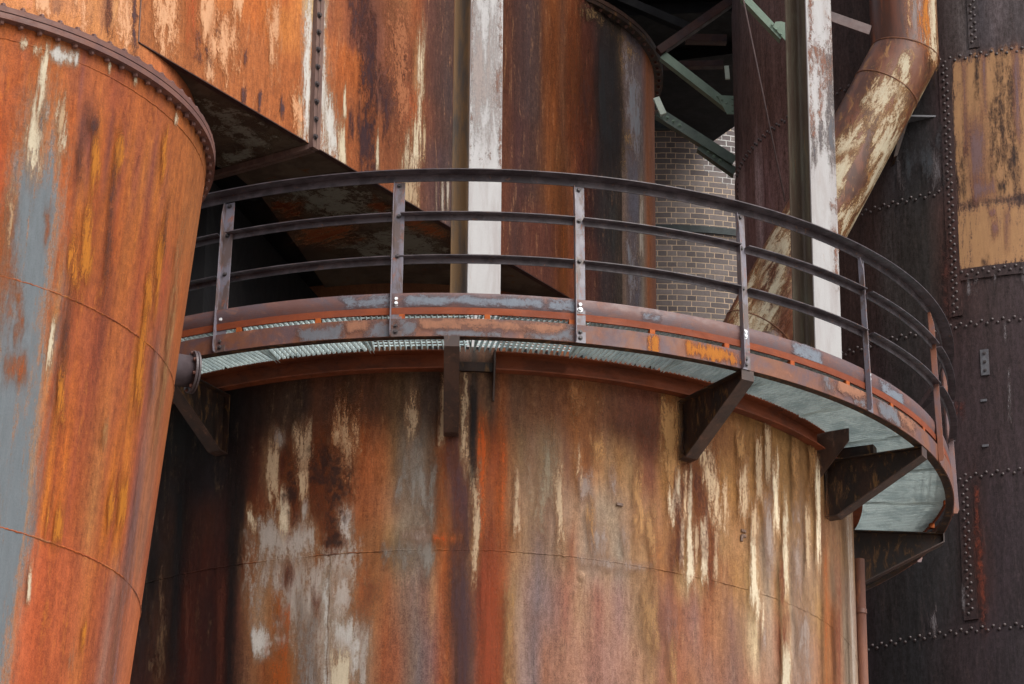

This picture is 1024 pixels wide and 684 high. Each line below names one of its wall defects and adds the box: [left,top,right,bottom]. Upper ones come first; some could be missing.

rust [105,0,139,57]
rust [152,0,180,59]
rust [194,0,249,92]
rust [348,0,416,171]
rust [470,0,503,167]
peeling [811,0,939,236]
rust [67,115,125,303]
peeling [730,226,792,332]
peeling [244,425,371,684]
rust [281,440,354,549]
peeling [331,402,362,489]
rust [672,453,717,587]